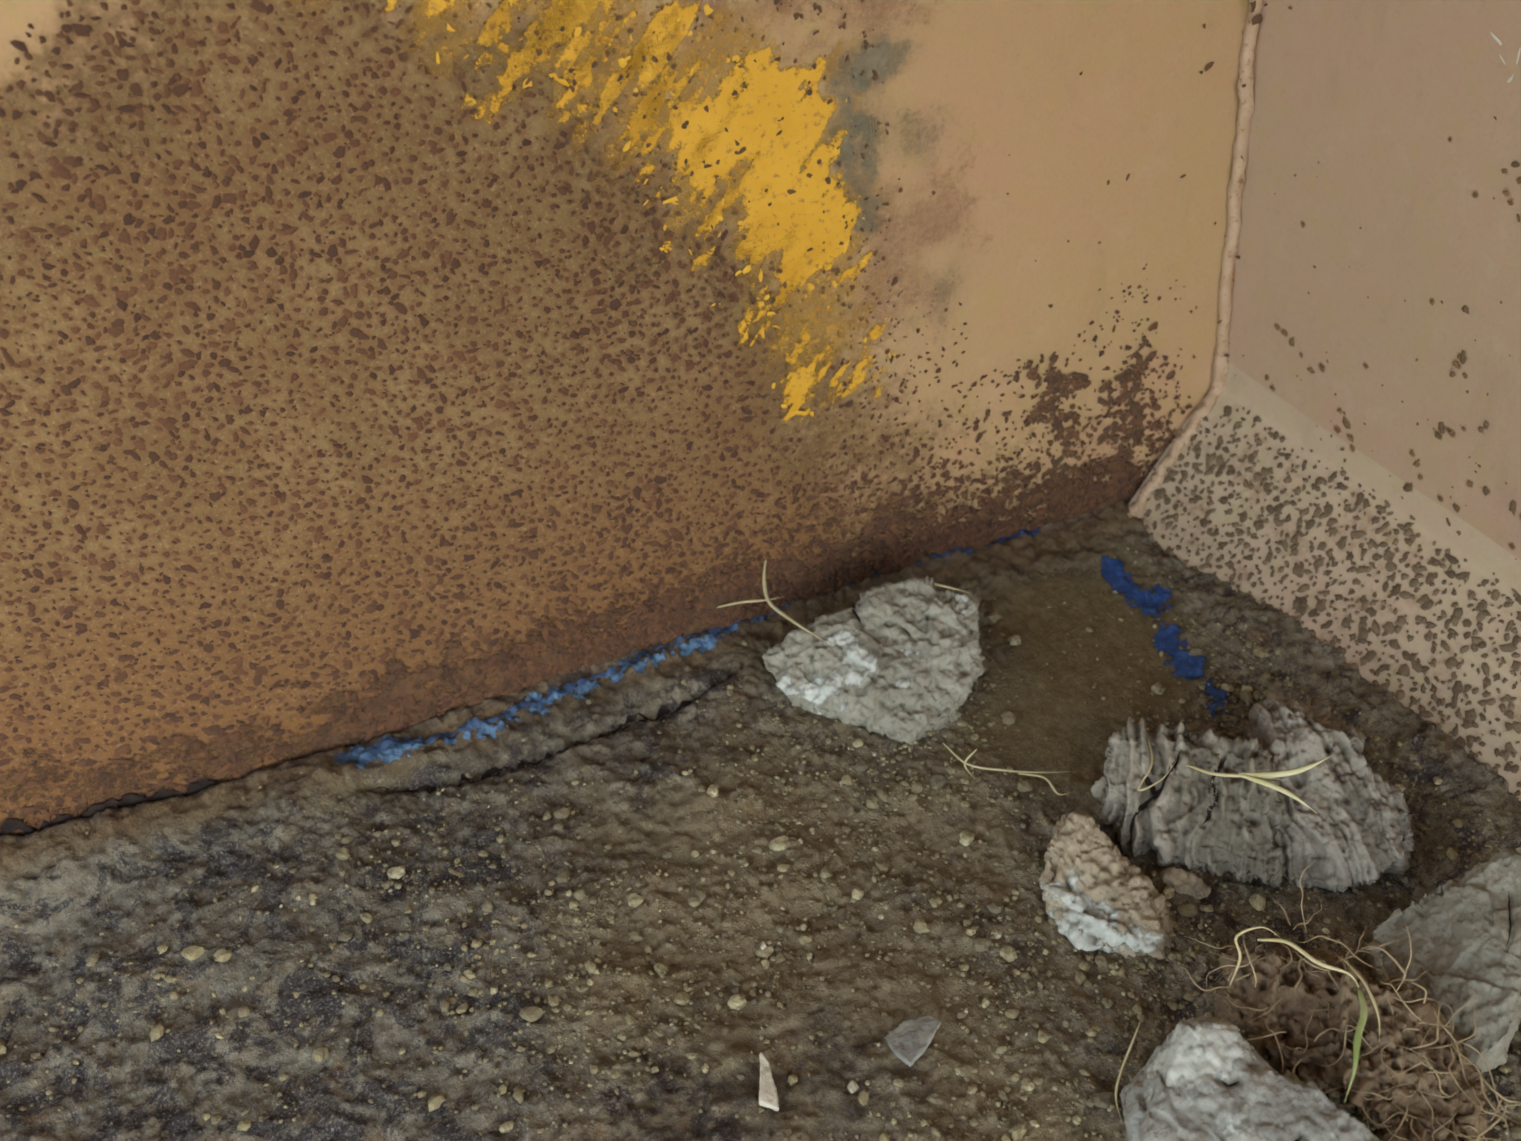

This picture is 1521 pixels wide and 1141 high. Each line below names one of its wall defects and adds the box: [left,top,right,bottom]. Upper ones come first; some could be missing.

peeling [417,0,456,41]
peeling [461,0,896,423]
water stain [502,0,974,390]
crack [368,667,743,793]